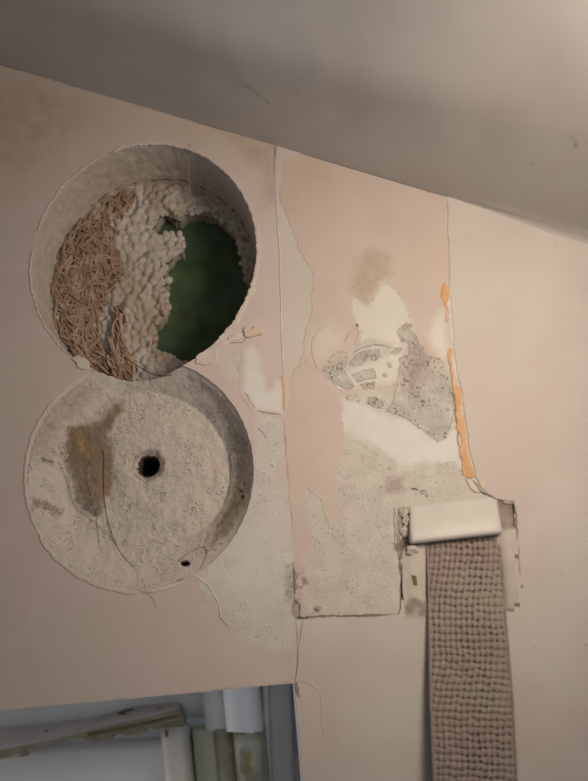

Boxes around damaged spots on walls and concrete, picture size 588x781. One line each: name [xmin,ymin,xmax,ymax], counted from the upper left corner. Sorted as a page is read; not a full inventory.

crack [275,155,283,365]
peeling [441,283,450,322]
damp [28,376,129,520]
peeling [177,375,307,659]
flaking render [323,323,486,488]